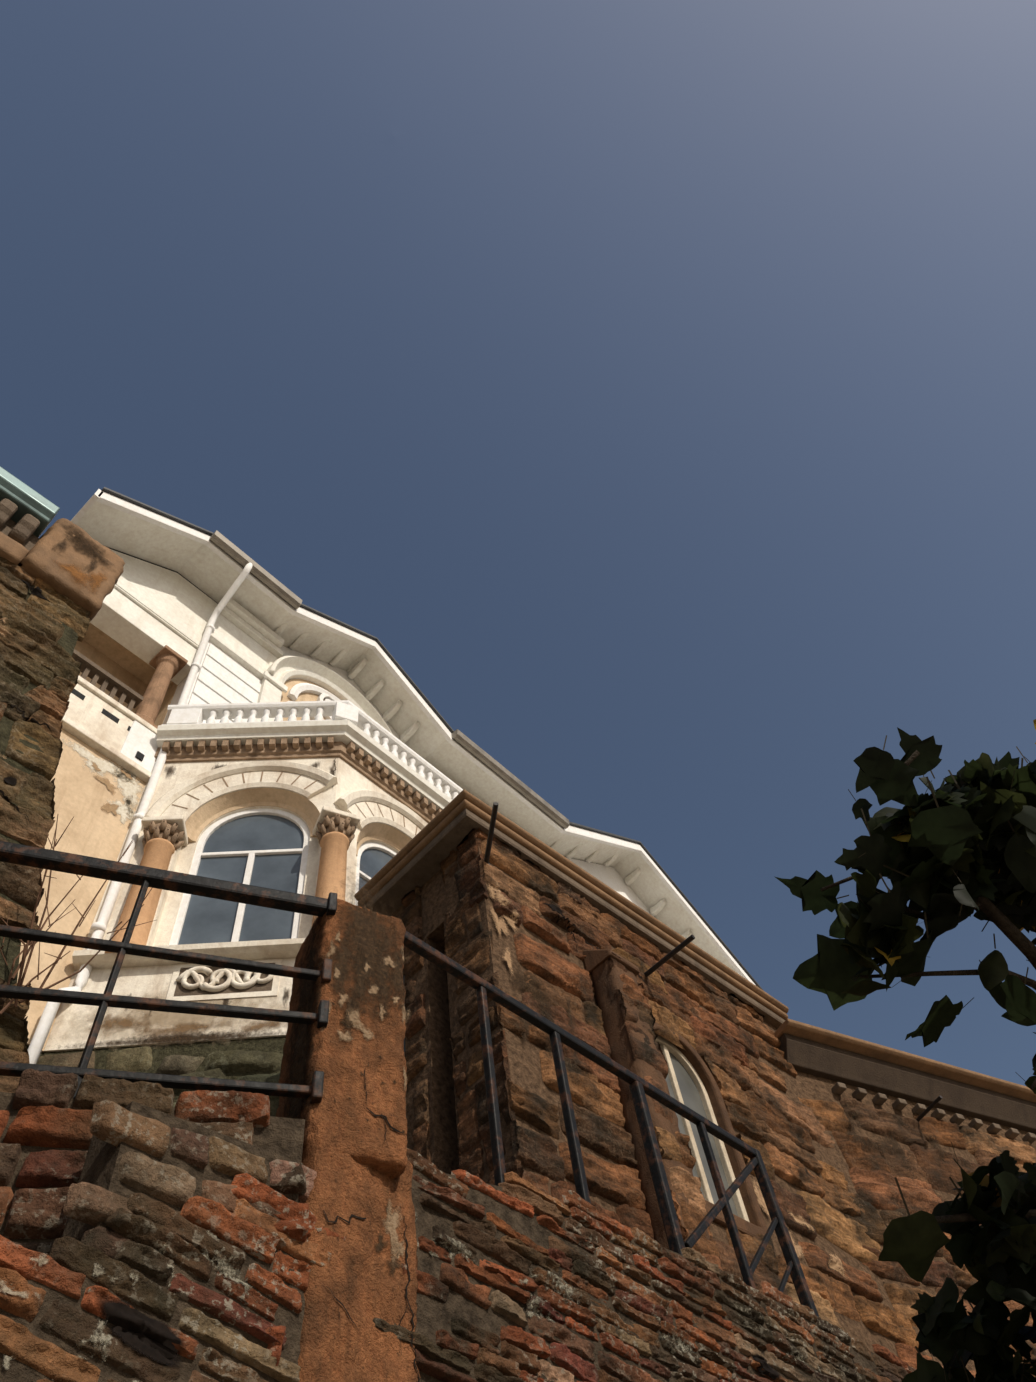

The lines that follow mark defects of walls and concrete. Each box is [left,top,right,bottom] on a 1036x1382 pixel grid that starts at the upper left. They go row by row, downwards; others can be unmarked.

crack [1,700,54,731]
crack [0,790,30,823]
crack [364,1066,402,1141]
crack [323,1210,366,1224]
crack [326,1286,359,1331]
crack [399,1207,420,1382]
spalling [101,1300,183,1366]